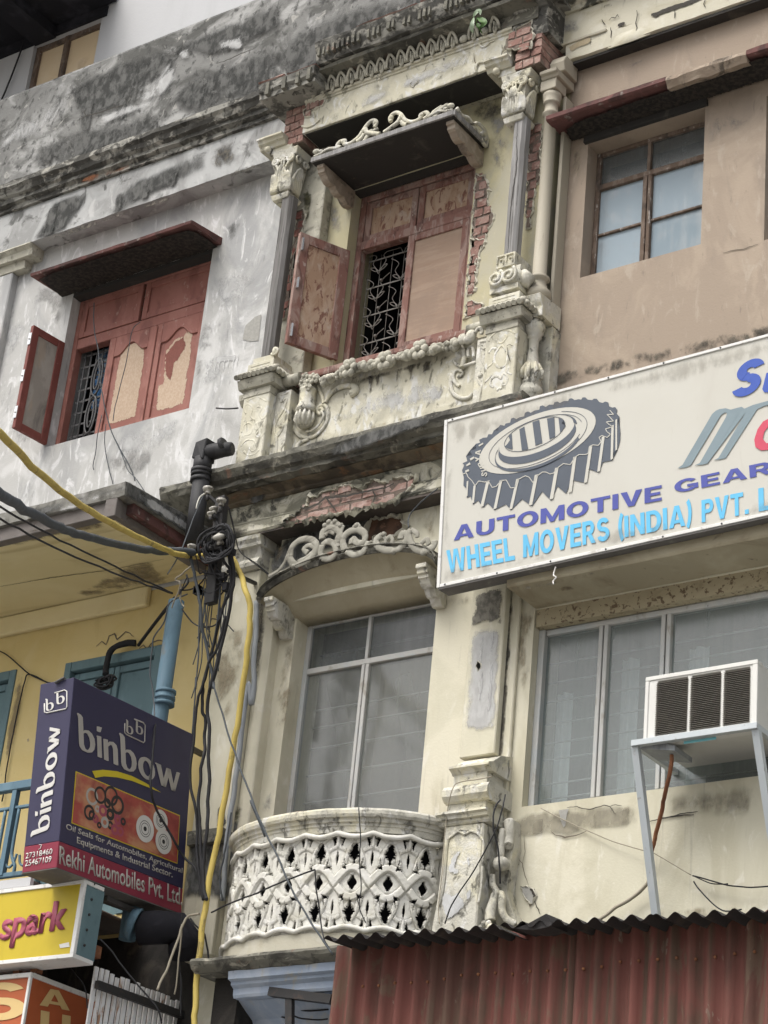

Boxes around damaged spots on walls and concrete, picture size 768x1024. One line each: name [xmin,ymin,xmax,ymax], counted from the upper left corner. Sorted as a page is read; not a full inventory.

spalling [503,19,590,77]
damp [38,8,278,163]
damp [115,157,202,216]
damp [215,145,258,175]
spalling [524,122,543,230]
spalling [463,173,496,320]
damp [725,328,768,344]
damp [557,351,669,384]
spalling [283,473,419,543]
peeling [472,589,501,625]
crack [551,804,622,838]
peeling [442,889,471,918]